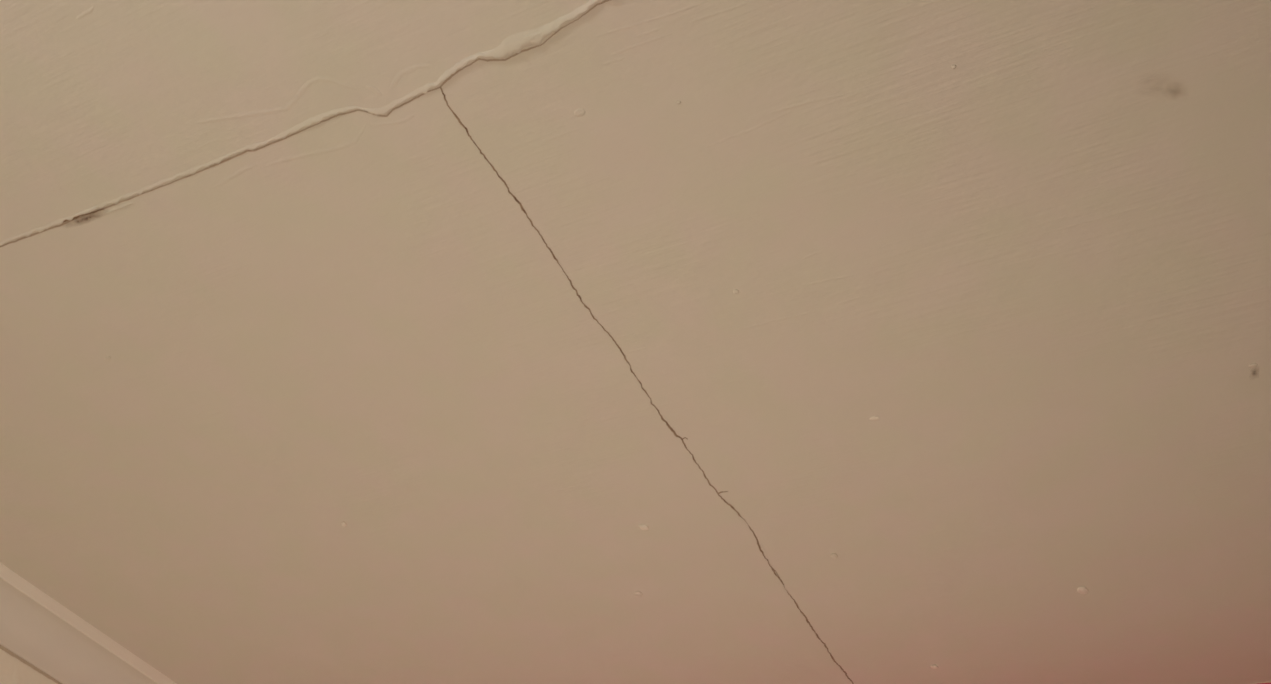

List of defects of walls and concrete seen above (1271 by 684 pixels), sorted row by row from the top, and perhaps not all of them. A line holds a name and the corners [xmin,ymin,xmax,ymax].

crack [0,0,858,684]